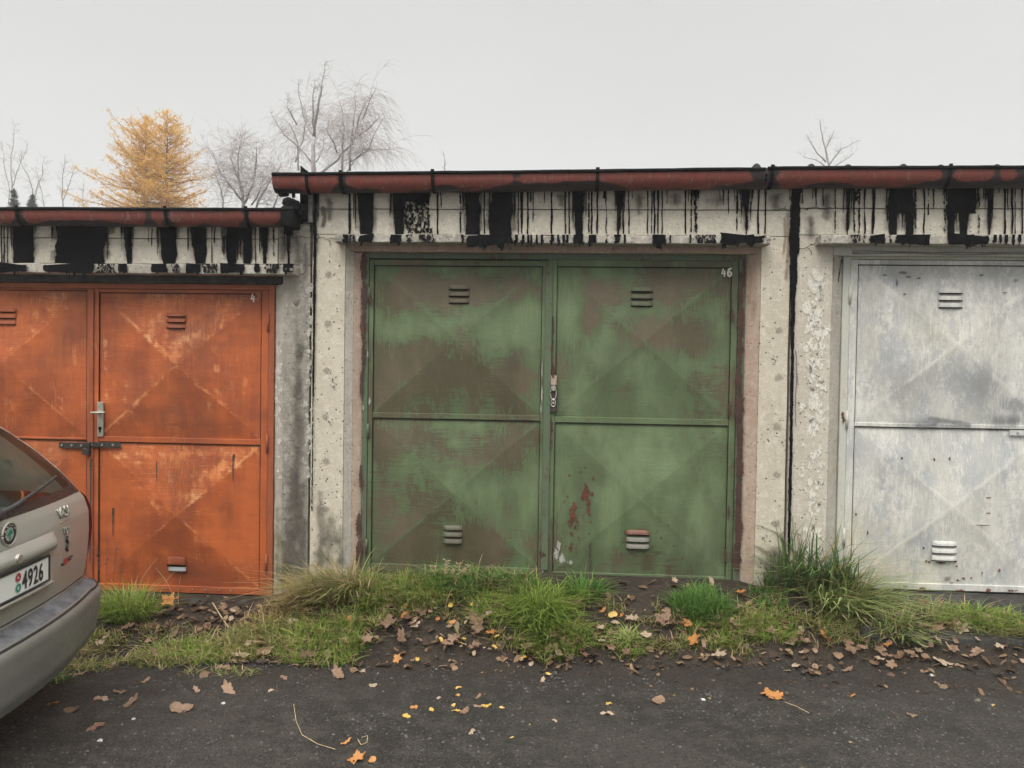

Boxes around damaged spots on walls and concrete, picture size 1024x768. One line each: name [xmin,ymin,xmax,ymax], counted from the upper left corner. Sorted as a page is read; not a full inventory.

damp [348,193,376,234]
damp [391,193,442,234]
damp [459,190,700,235]
damp [717,188,1024,254]
damp [0,226,35,263]
damp [52,226,133,264]
damp [148,194,343,592]
peeling [799,267,831,566]
corrosion [563,466,594,571]